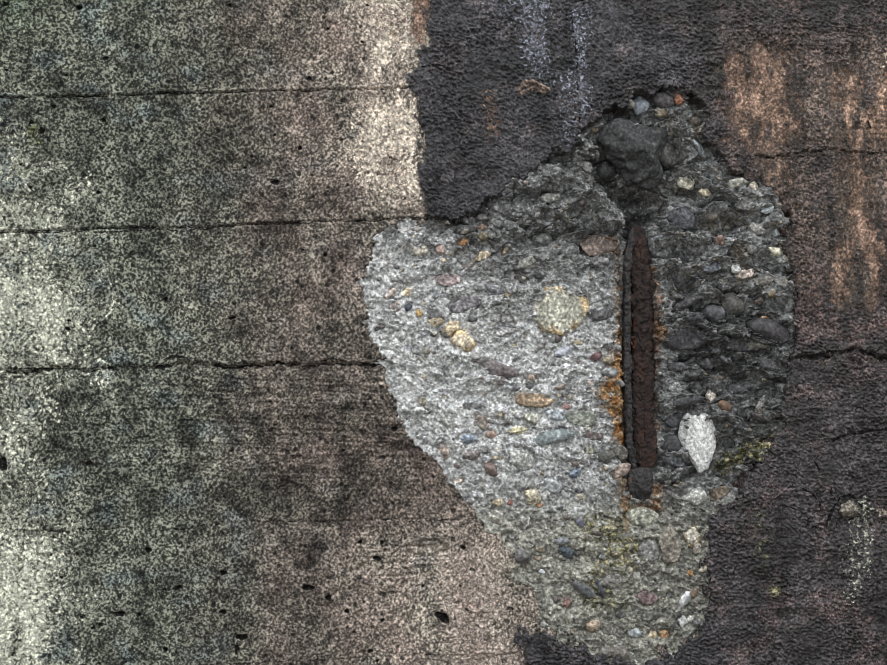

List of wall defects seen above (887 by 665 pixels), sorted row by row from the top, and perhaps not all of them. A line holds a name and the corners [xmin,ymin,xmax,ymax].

rust [648,258,668,374]
crack [0,346,115,375]
crack [155,354,379,369]
spalling [357,39,803,665]
rust [598,328,635,445]
crack [788,349,886,362]
rust [614,472,663,526]